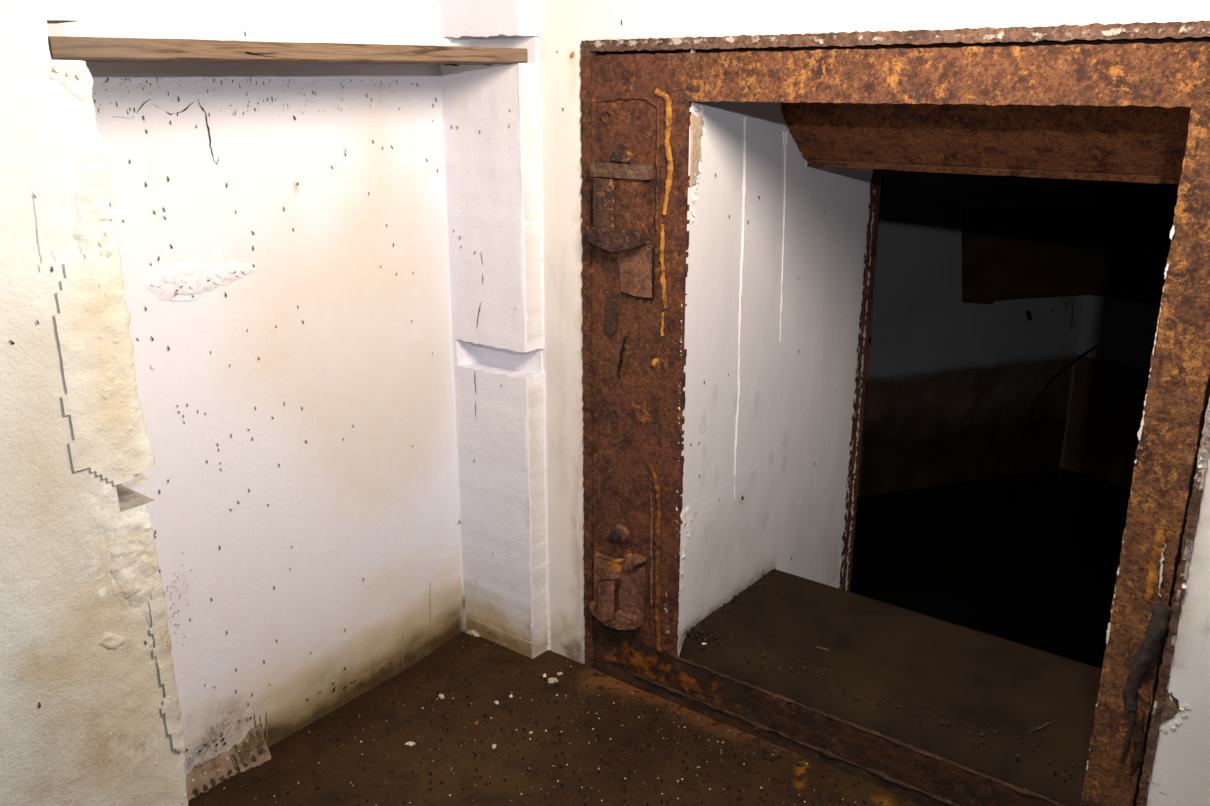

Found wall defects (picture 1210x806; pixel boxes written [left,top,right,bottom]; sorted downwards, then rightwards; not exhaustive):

crack [112,99,219,164]
corrosion [569,159,583,267]
leakage [540,0,901,246]
corrosion [556,1,1210,106]
leakage [0,64,585,806]
corrosion [839,174,873,589]
peeling [109,475,172,666]
corrosion [564,471,585,618]
corrosion [1169,453,1210,676]
corrosion [574,641,815,792]